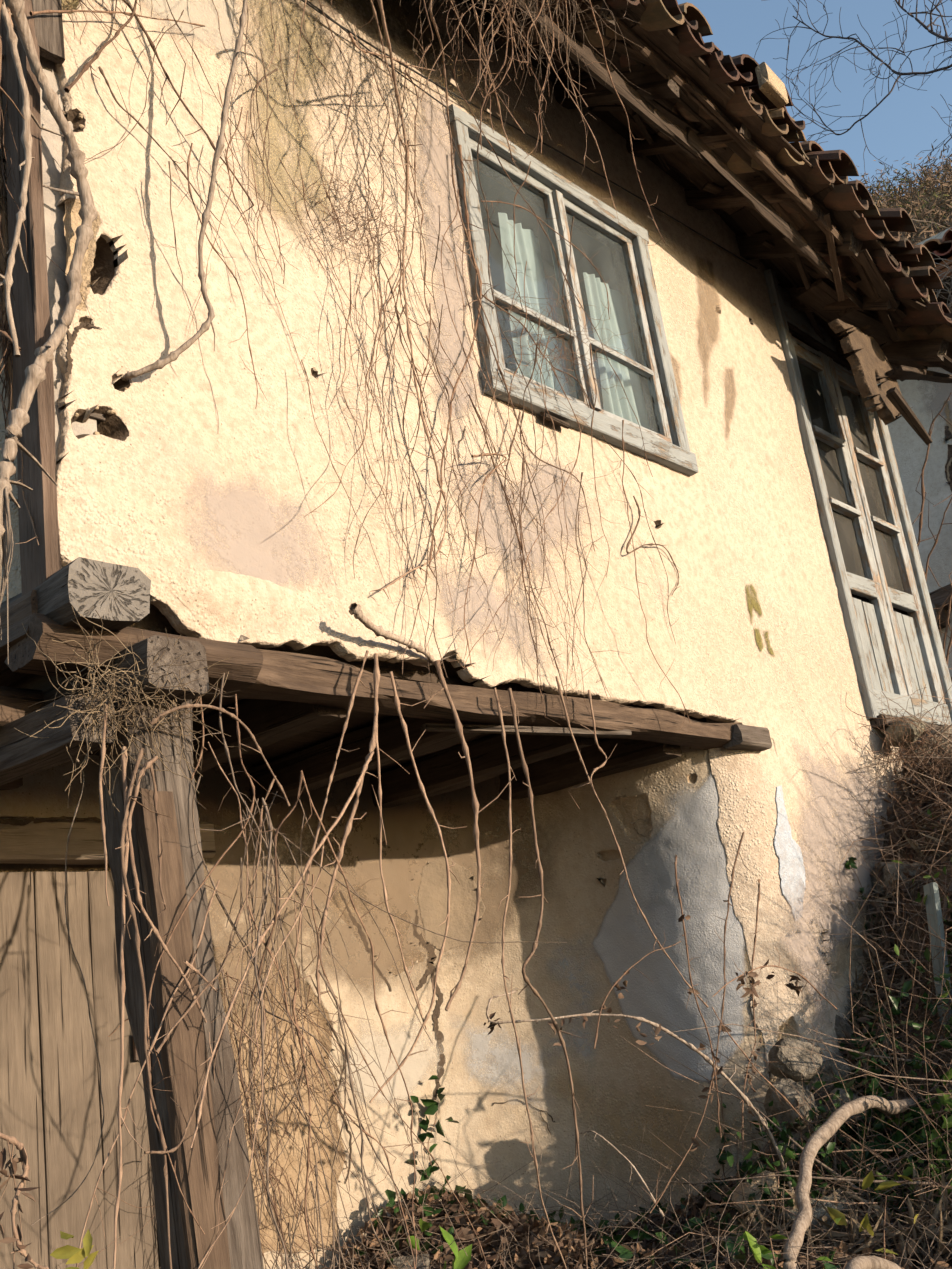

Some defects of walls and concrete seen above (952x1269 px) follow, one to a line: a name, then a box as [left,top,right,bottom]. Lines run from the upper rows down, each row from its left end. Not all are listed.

flaking render [63,198,115,330]
hole [71,406,129,441]
hole [112,374,131,392]
flaking render [443,651,460,662]
peeling [774,785,806,922]
peeling [593,774,746,1081]
crack [339,891,446,1100]
flaking render [760,1016,798,1044]